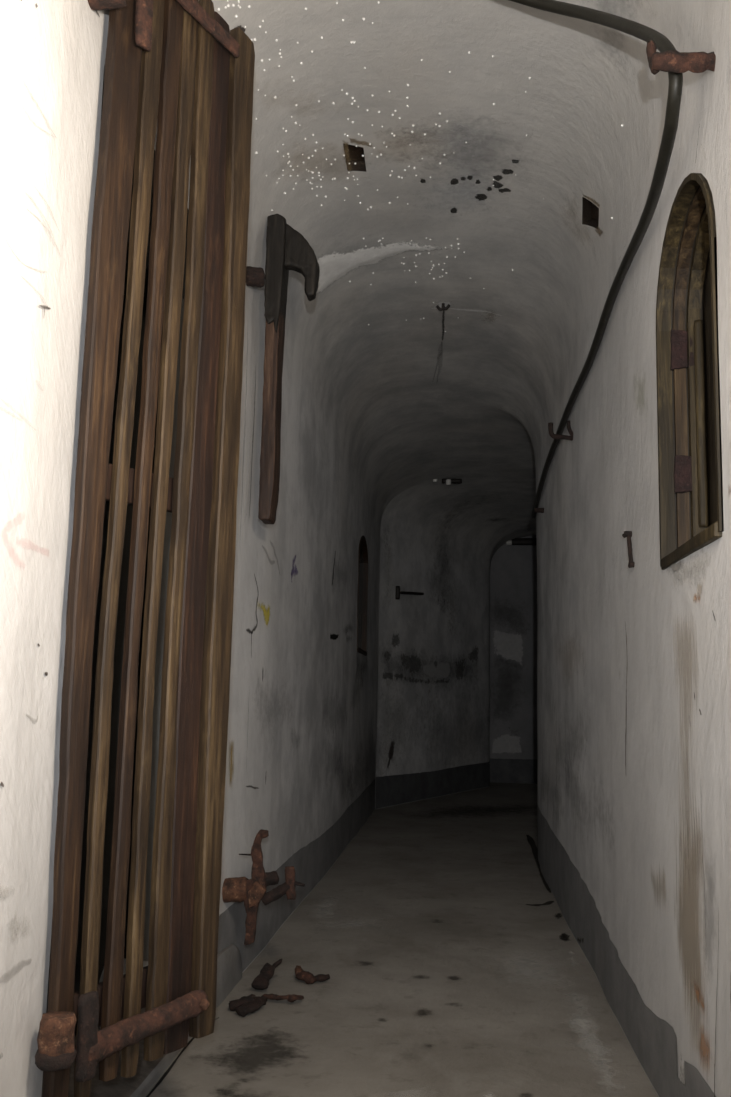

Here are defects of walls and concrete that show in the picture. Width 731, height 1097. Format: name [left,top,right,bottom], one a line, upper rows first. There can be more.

damp [450,159,519,201]